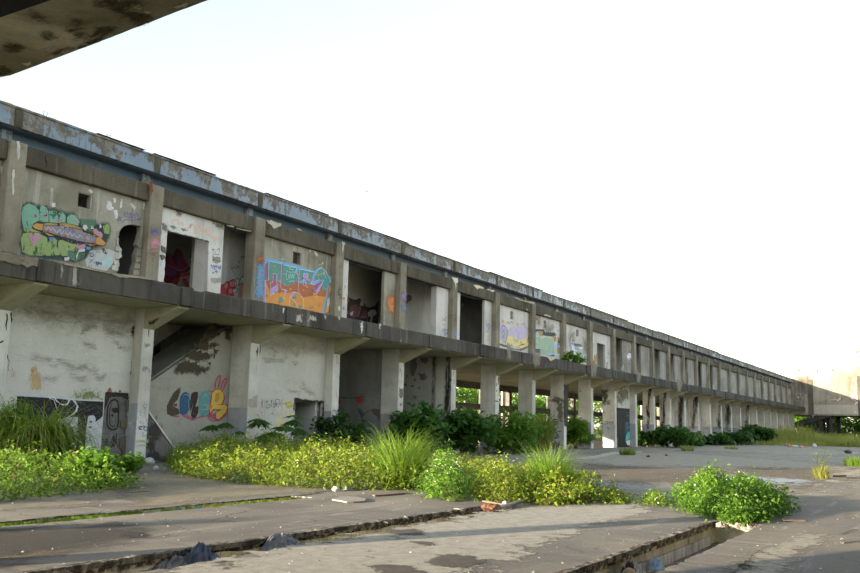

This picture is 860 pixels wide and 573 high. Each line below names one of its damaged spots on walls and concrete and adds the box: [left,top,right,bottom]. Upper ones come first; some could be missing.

mould [44,20,119,56]
mould [95,0,152,26]
peeling [1,141,20,195]
peeling [106,198,145,219]
spalling [64,228,153,280]
water stain [175,323,233,377]